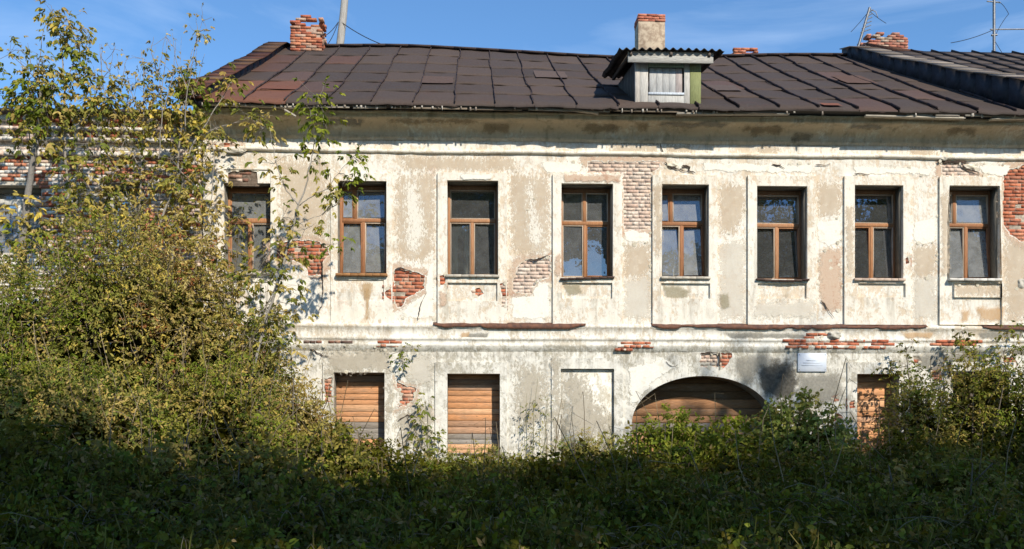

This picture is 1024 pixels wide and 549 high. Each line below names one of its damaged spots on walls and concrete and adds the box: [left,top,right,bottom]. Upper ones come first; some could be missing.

peeling [263,157,331,320]
flaking render [382,143,855,321]
flaking render [854,146,1024,325]
peeling [304,340,436,450]
peeling [615,339,679,405]
flaking render [700,352,732,370]
damp [737,355,841,405]
flaking render [782,331,895,351]